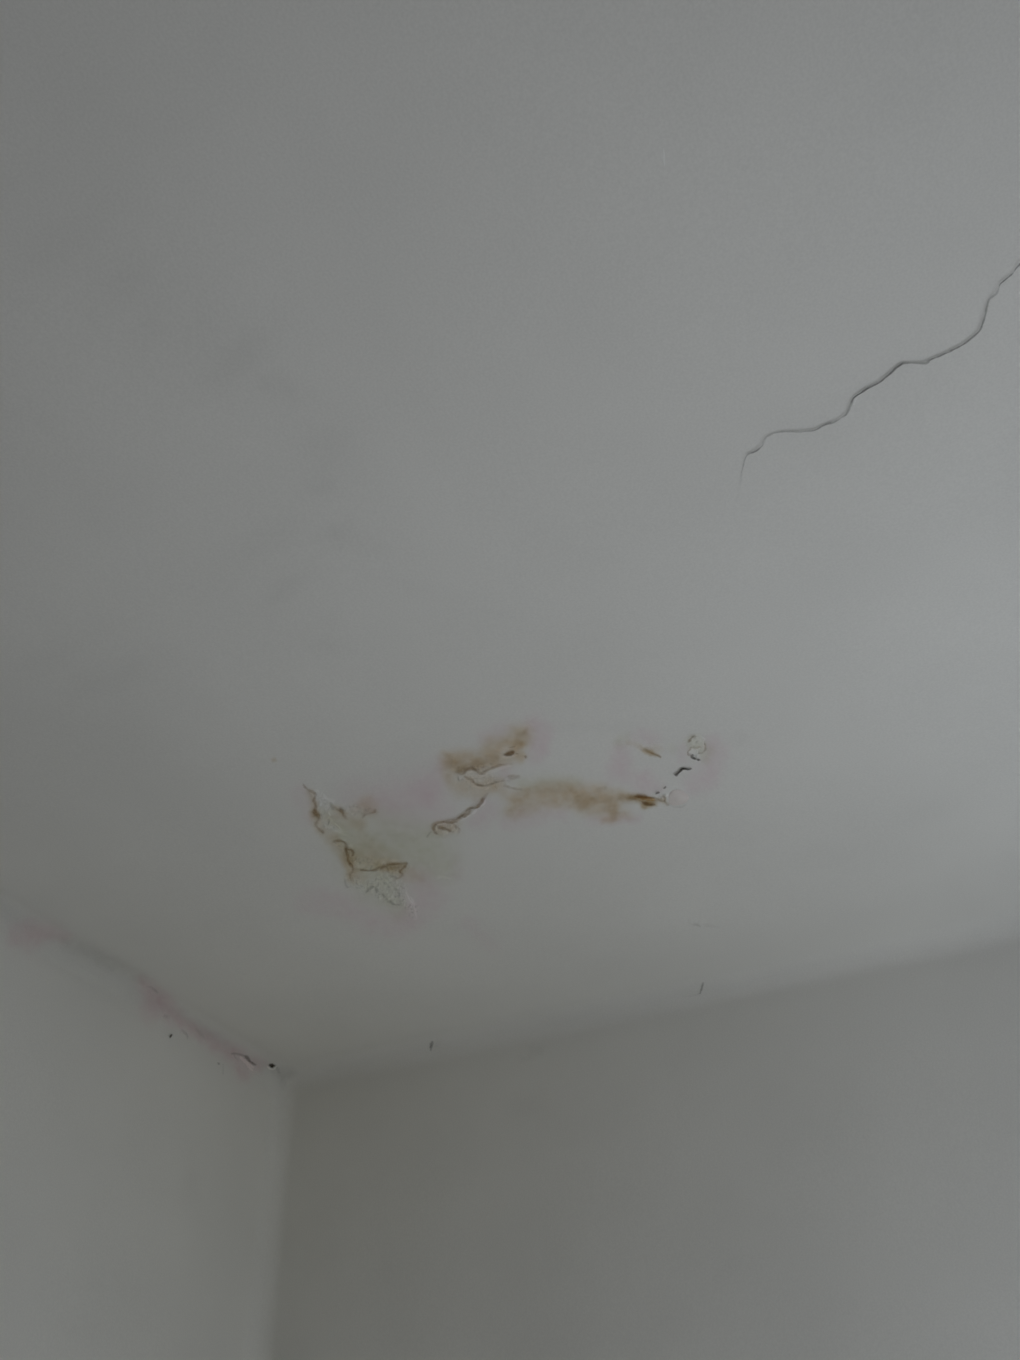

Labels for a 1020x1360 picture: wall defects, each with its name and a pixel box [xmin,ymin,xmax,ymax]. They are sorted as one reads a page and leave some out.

crack [852,332,979,405]